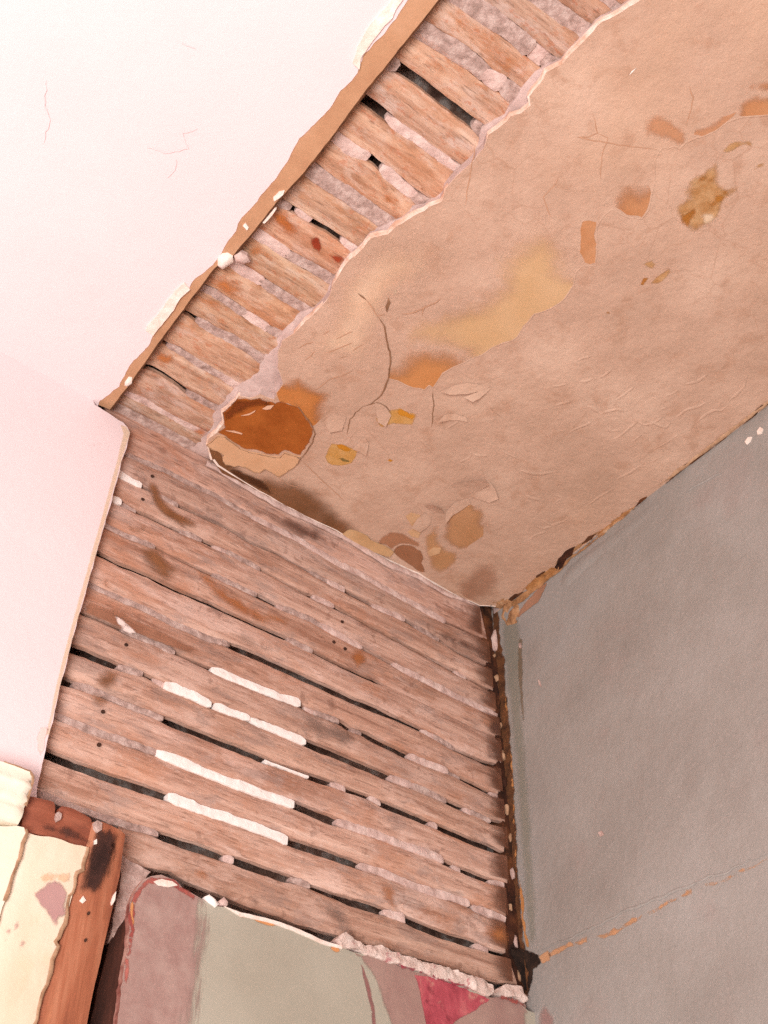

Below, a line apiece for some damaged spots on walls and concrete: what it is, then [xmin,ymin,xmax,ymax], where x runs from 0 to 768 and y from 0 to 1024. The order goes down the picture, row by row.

crack [578,116,657,179]
spalling [146,282,190,336]
damp [329,265,401,351]
crack [347,294,440,432]
spalling [190,0,640,626]
damp [425,246,573,356]
peeling [389,84,768,402]
crack [480,401,768,1008]
spalling [125,878,528,1005]